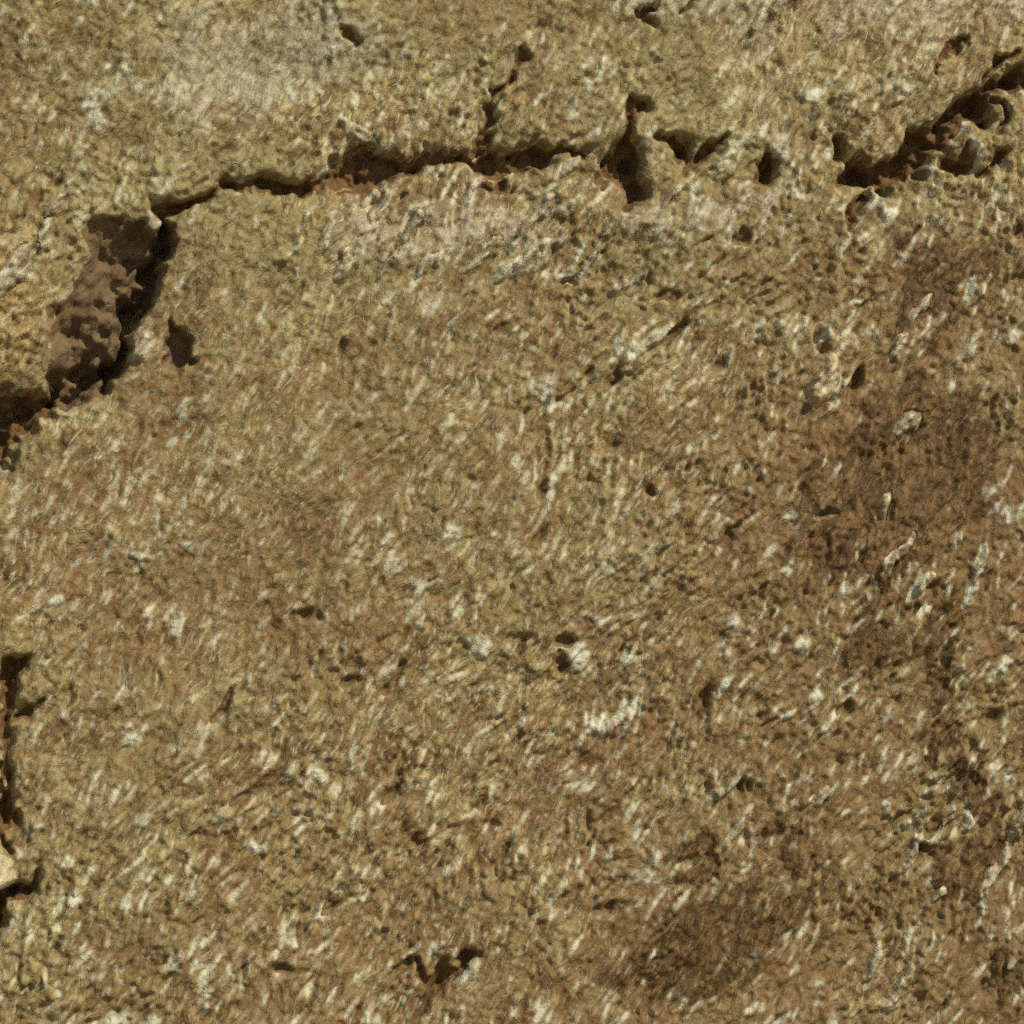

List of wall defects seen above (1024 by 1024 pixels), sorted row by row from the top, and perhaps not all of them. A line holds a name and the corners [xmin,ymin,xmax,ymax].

crack [934,37,967,74]
crack [151,46,724,220]
crack [835,49,1024,232]
crack [753,153,772,186]
peeling [146,210,162,232]
spalling [129,319,197,371]
crack [0,392,55,465]
crack [0,656,45,856]
crack [0,872,39,923]